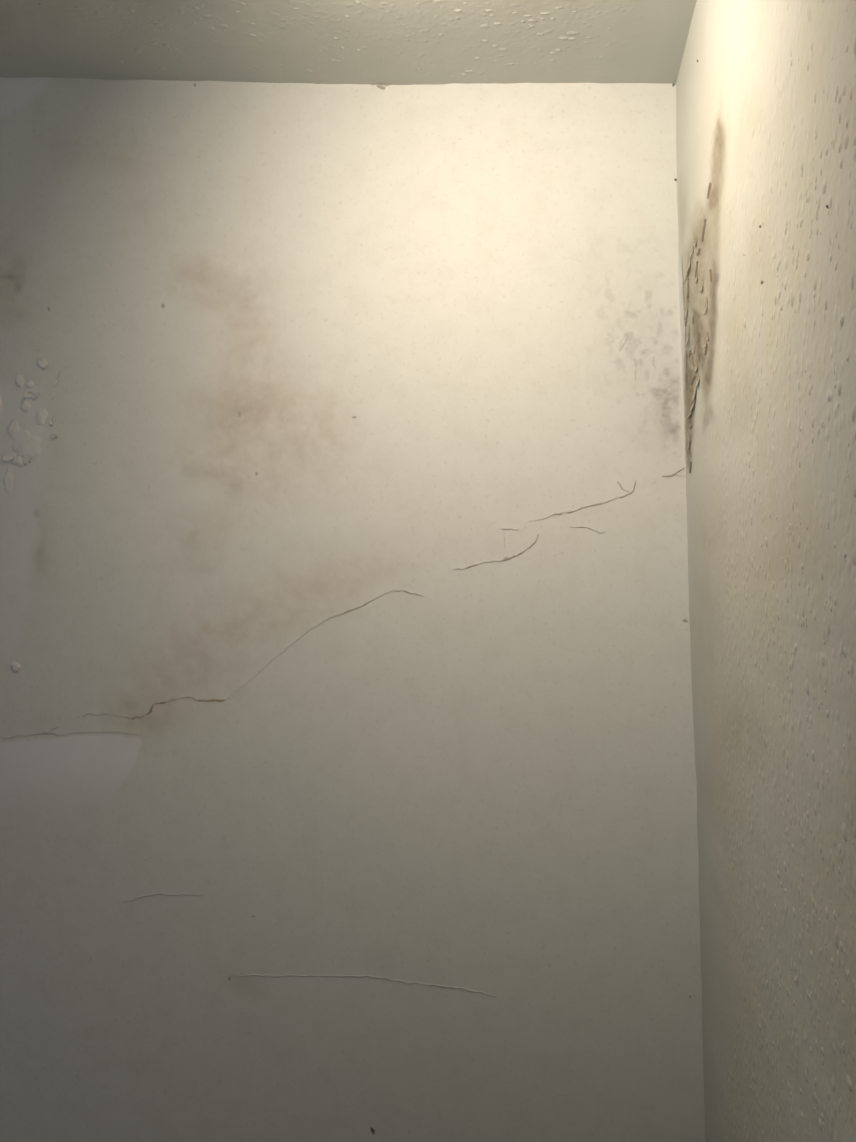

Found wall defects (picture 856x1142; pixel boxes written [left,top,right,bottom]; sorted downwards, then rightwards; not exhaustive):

crack [453,467,685,570]
crack [0,590,423,739]